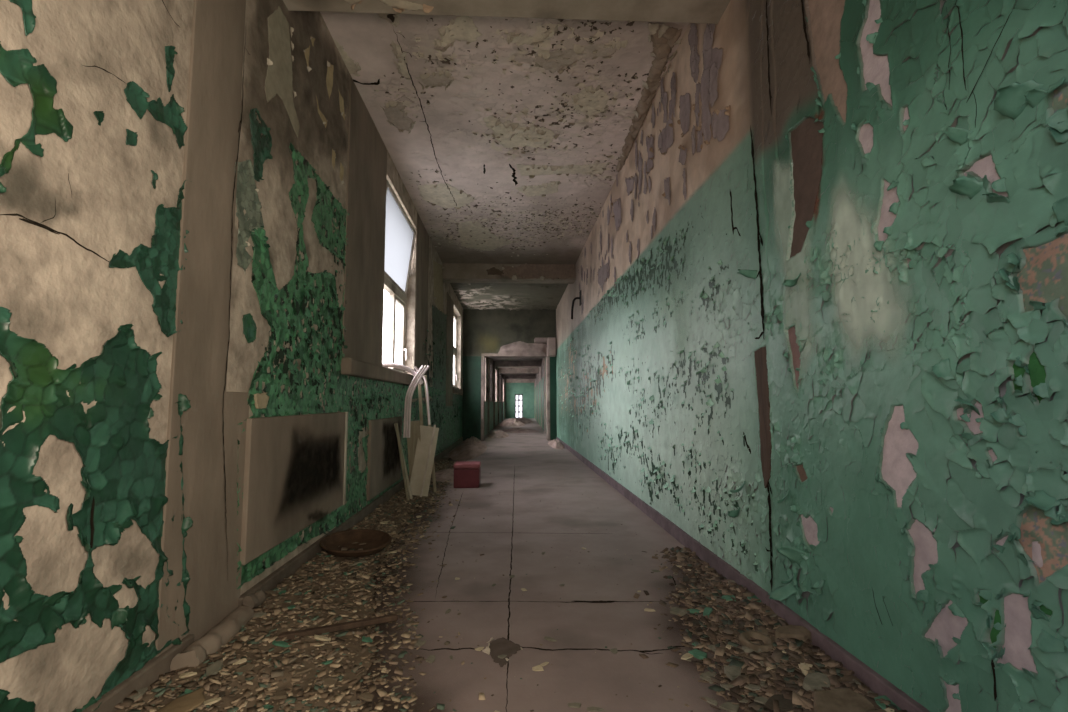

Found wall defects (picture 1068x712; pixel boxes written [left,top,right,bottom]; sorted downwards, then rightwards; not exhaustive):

peeling [0,41,73,193]
peeling [124,45,188,148]
crack [353,78,380,86]
crack [395,32,457,212]
crack [0,173,109,262]
peeling [109,180,192,337]
peeling [234,6,463,589]
peeling [558,223,758,572]
peeling [0,307,193,712]
crack [571,597,617,605]
crack [523,646,686,654]
crack [765,481,773,591]